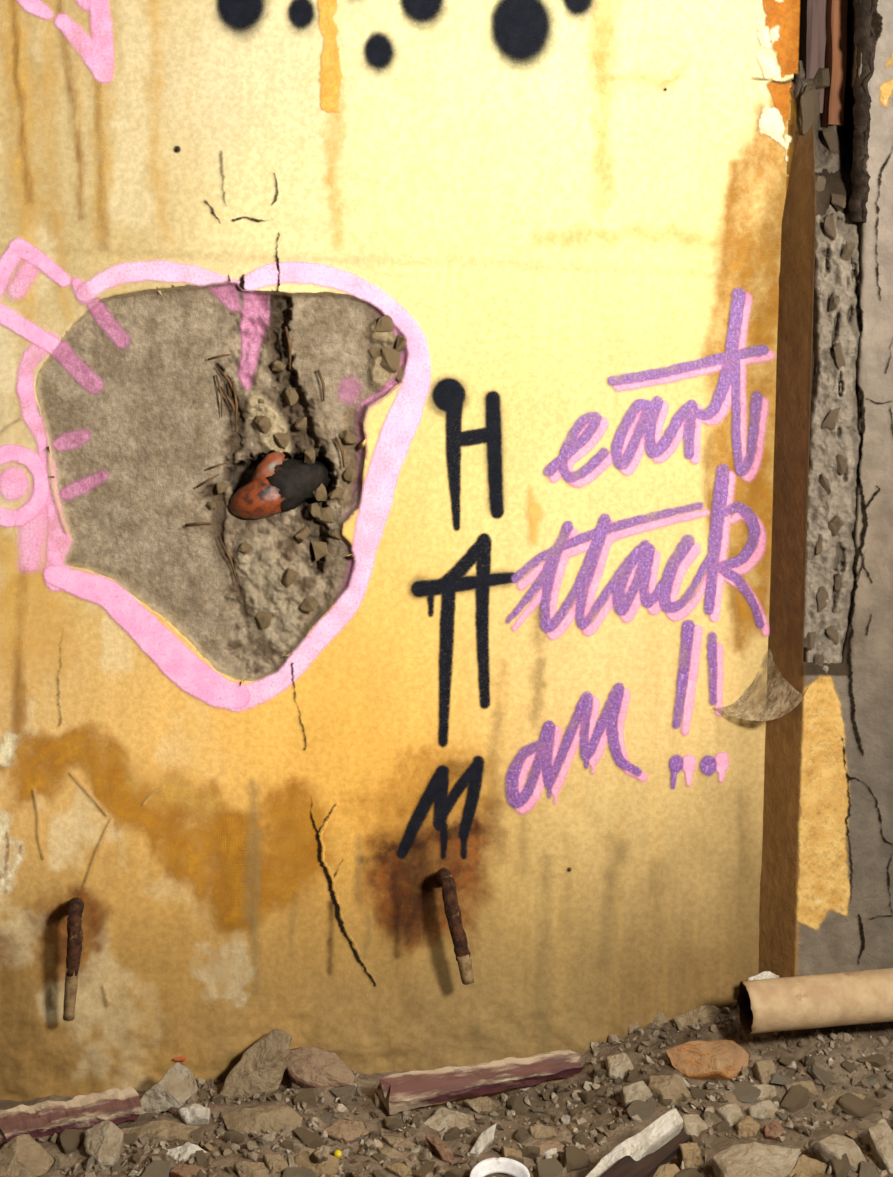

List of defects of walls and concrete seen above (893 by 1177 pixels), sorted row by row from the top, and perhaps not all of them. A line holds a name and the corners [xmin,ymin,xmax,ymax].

crack [871,8,883,41]
crack [857,148,893,332]
spalling [35,281,407,681]
spalling [757,0,893,929]
peeling [0,733,18,766]
peeling [0,813,23,892]
corrosion [49,890,100,964]
water stain [0,729,322,934]
crack [310,803,376,987]
corrosion [361,819,491,947]
corrosion [446,761,465,793]
crack [842,380,893,964]